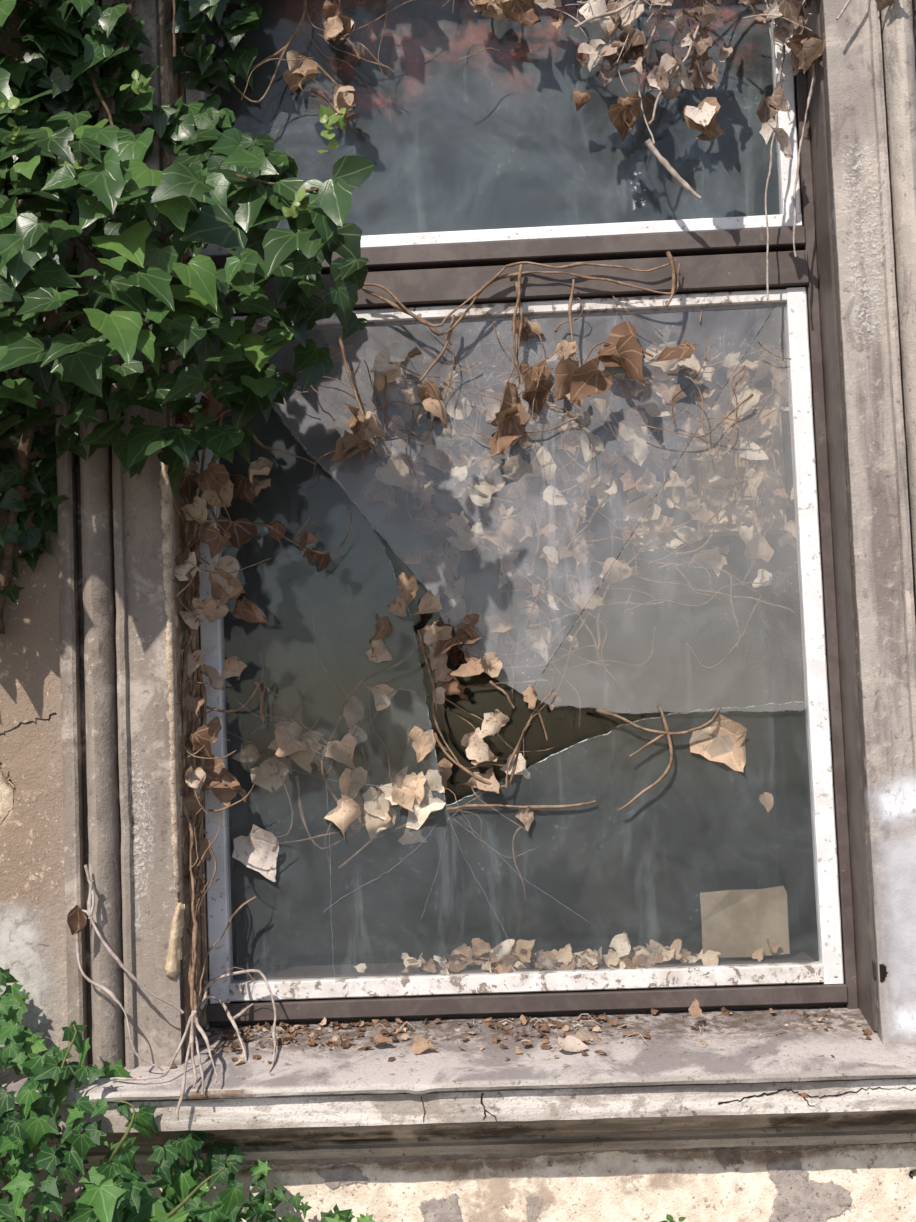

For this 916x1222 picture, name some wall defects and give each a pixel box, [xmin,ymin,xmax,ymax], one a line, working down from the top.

crack [0,712,56,735]
spalling [0,761,14,824]
leakage [886,837,916,1036]
crack [718,1087,916,1106]
peeling [141,1174,162,1197]
peeling [197,1143,916,1222]